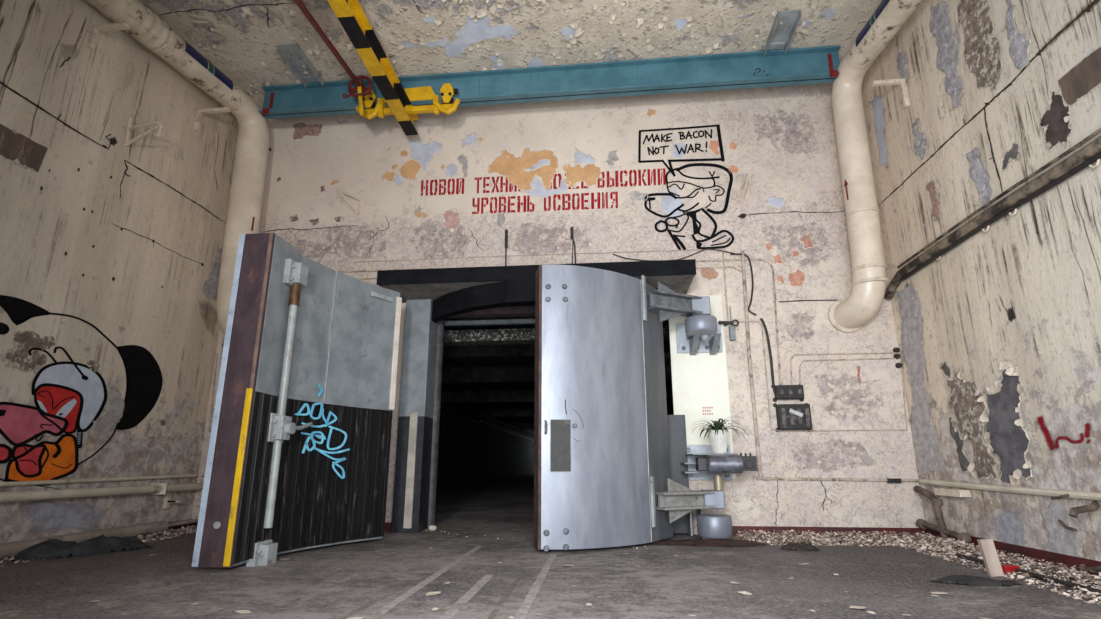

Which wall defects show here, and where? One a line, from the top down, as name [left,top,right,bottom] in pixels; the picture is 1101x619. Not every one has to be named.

peeling [182,4,371,98]
peeling [382,0,791,77]
peeling [794,1,867,43]
peeling [929,0,1031,111]
peeling [488,147,619,198]
spalling [895,280,1033,487]